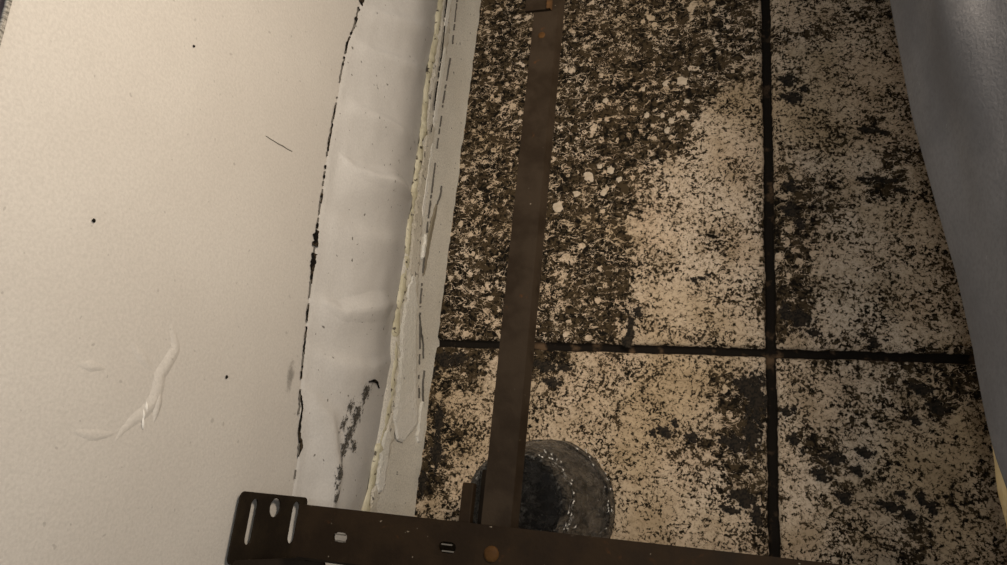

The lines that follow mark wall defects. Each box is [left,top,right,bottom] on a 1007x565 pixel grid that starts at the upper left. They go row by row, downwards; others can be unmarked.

water stain [778,73,807,104]
crack [294,0,365,479]
water stain [621,306,643,348]
water stain [432,349,469,379]
water stain [532,359,573,389]
water stain [334,379,380,503]
water stain [418,399,447,497]
water stain [648,417,703,444]
water stain [718,362,797,460]
water stain [786,431,877,507]
water stain [718,486,763,533]
water stain [872,490,938,522]